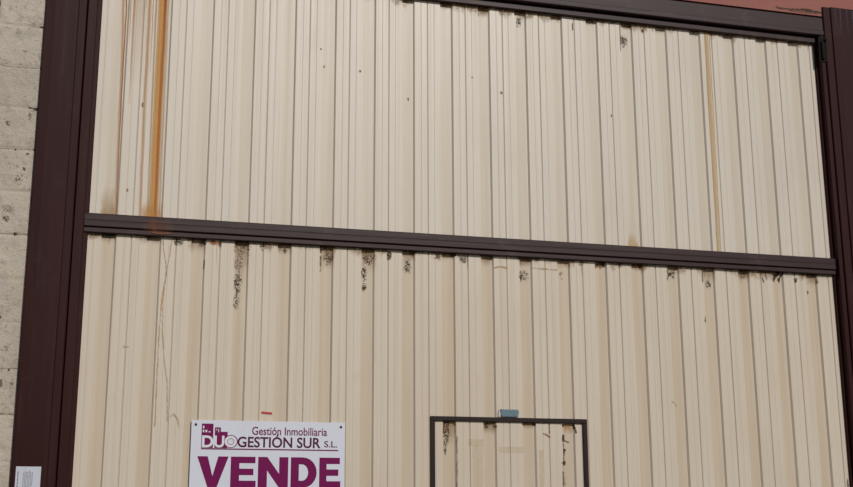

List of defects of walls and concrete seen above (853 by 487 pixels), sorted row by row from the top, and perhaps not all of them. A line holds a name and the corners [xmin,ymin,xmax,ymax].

rust [117,0,135,183]
rust [140,0,167,217]
water stain [233,241,292,308]
water stain [320,246,392,291]
water stain [727,269,784,284]